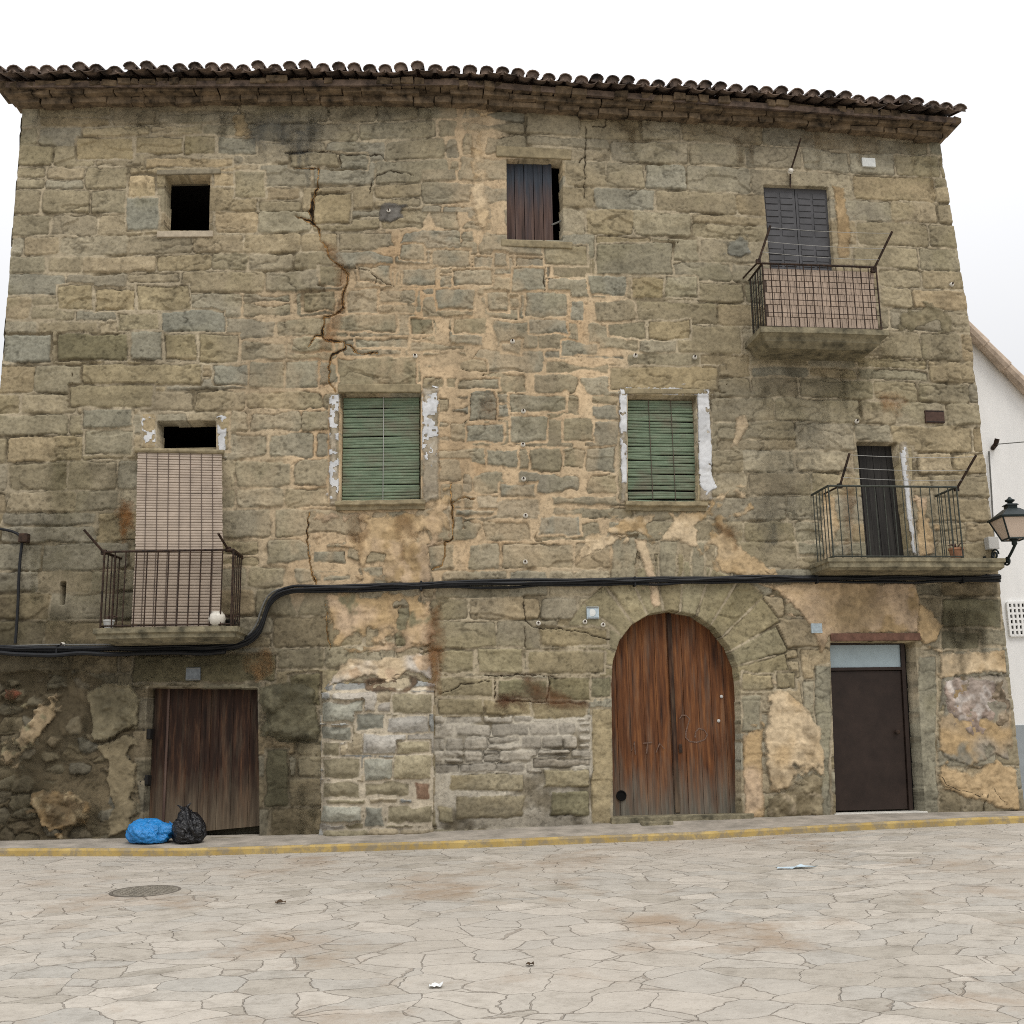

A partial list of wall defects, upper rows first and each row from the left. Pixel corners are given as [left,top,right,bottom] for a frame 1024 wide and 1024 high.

crack [285,150,411,392]
peeling [326,394,339,499]
peeling [422,386,438,466]
crack [306,512,331,648]
peeling [573,387,1022,817]
peeling [0,690,58,768]
spalling [26,790,89,839]
peeling [87,683,139,837]